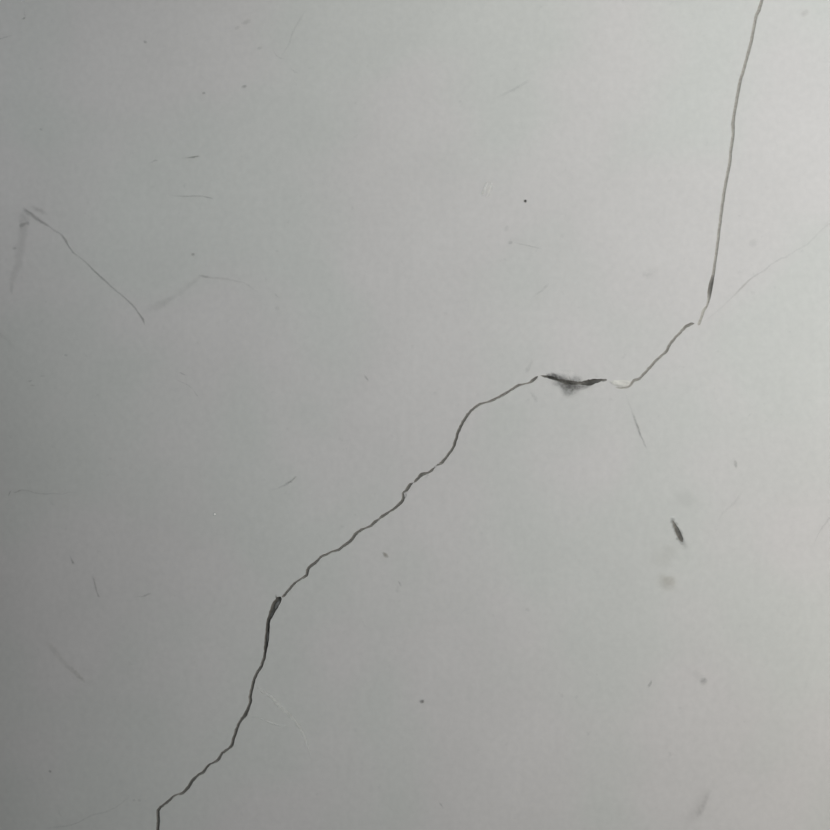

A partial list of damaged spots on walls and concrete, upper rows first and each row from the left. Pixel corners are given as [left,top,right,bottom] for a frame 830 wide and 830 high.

crack [610,0,763,389]
crack [156,376,538,830]